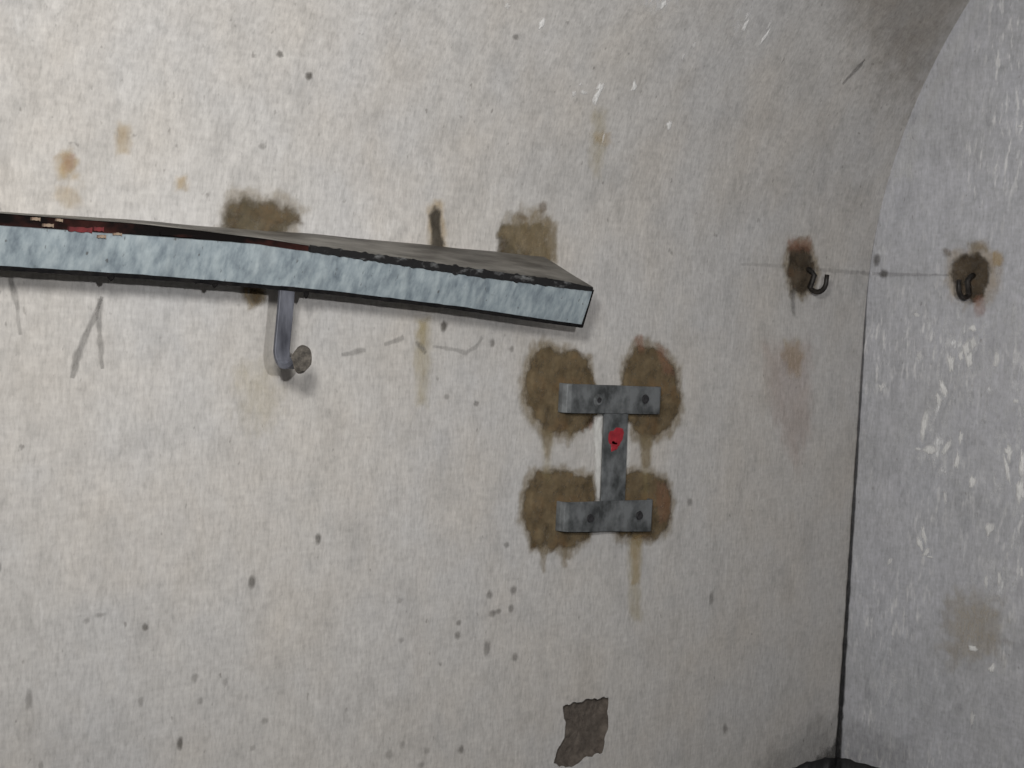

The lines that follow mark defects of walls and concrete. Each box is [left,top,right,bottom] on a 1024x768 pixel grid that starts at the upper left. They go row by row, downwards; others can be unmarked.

corrosion [430,208,443,247]
spalling [554,697,608,767]